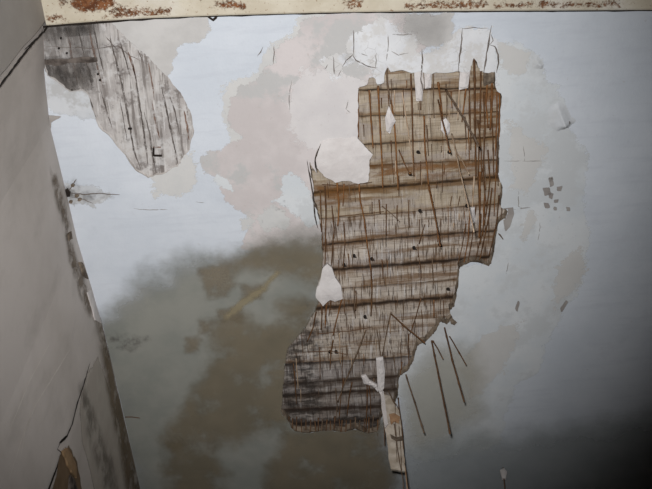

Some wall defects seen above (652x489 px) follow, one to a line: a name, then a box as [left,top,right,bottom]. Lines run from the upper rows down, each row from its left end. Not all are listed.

corrosion [59,0,172,18]
corrosion [216,0,246,10]
corrosion [405,0,620,10]
crack [0,10,652,87]
flaking render [42,13,591,473]
leakage [100,237,398,489]
crack [48,364,90,489]